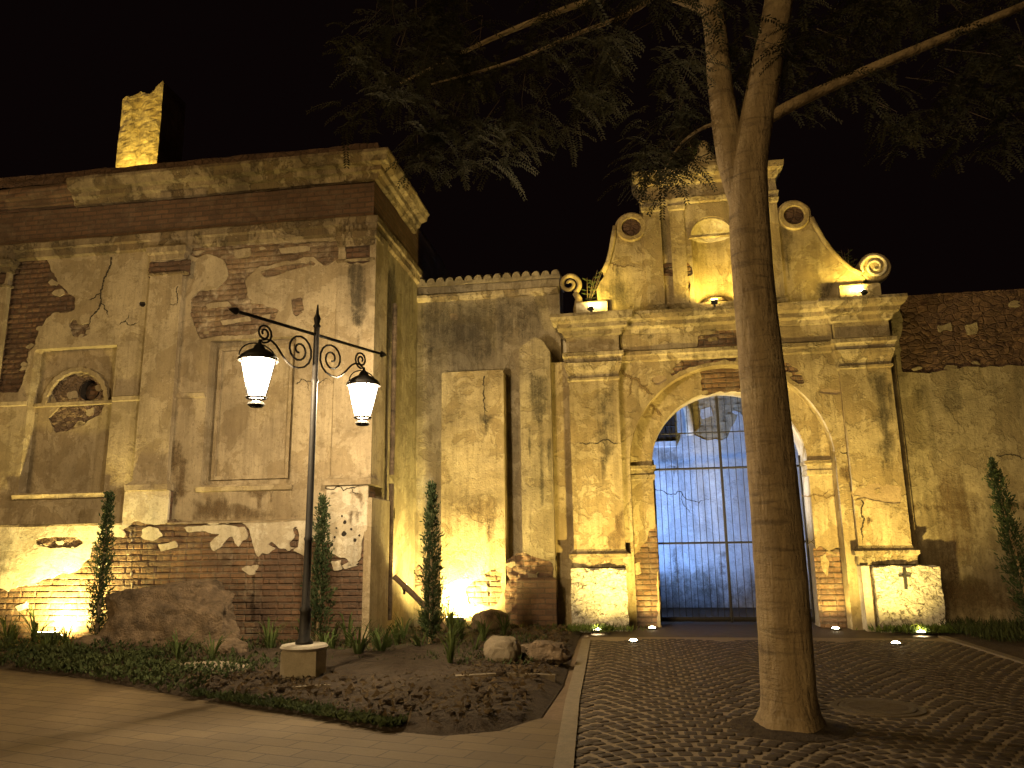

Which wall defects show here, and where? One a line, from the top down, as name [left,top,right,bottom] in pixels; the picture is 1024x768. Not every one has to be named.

flaking render [0,260,91,393]
crack [83,257,136,330]
flaking render [148,241,370,339]
leakage [349,264,362,324]
flaking render [667,330,741,396]
spalling [50,374,104,433]
crack [858,499,866,546]
flaking render [0,515,364,644]
spalling [465,553,554,624]
flaking render [634,524,662,628]
flaking render [813,546,848,628]